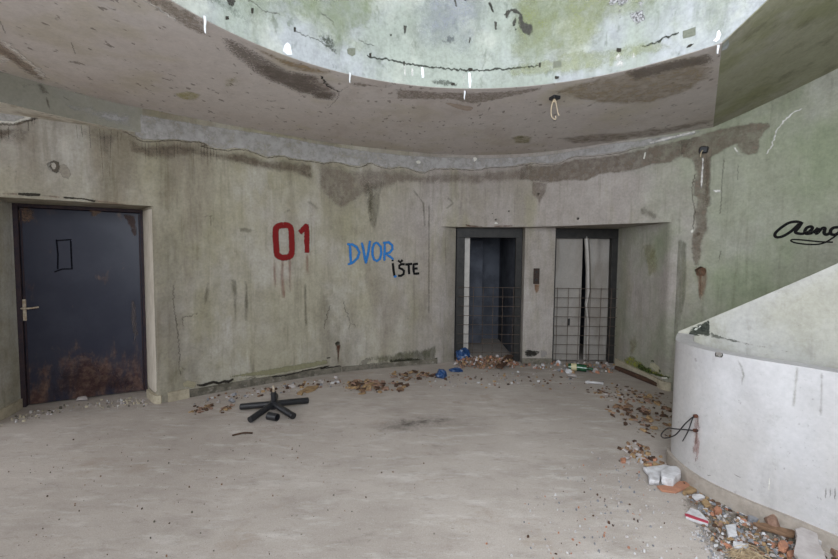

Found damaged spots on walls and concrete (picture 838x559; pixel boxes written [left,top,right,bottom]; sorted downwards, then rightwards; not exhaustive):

damp [223,38,336,100]
damp [562,54,712,102]
peeling [0,113,32,124]
damp [128,133,221,156]
peeling [135,116,695,172]
damp [227,149,438,205]
damp [471,109,801,262]